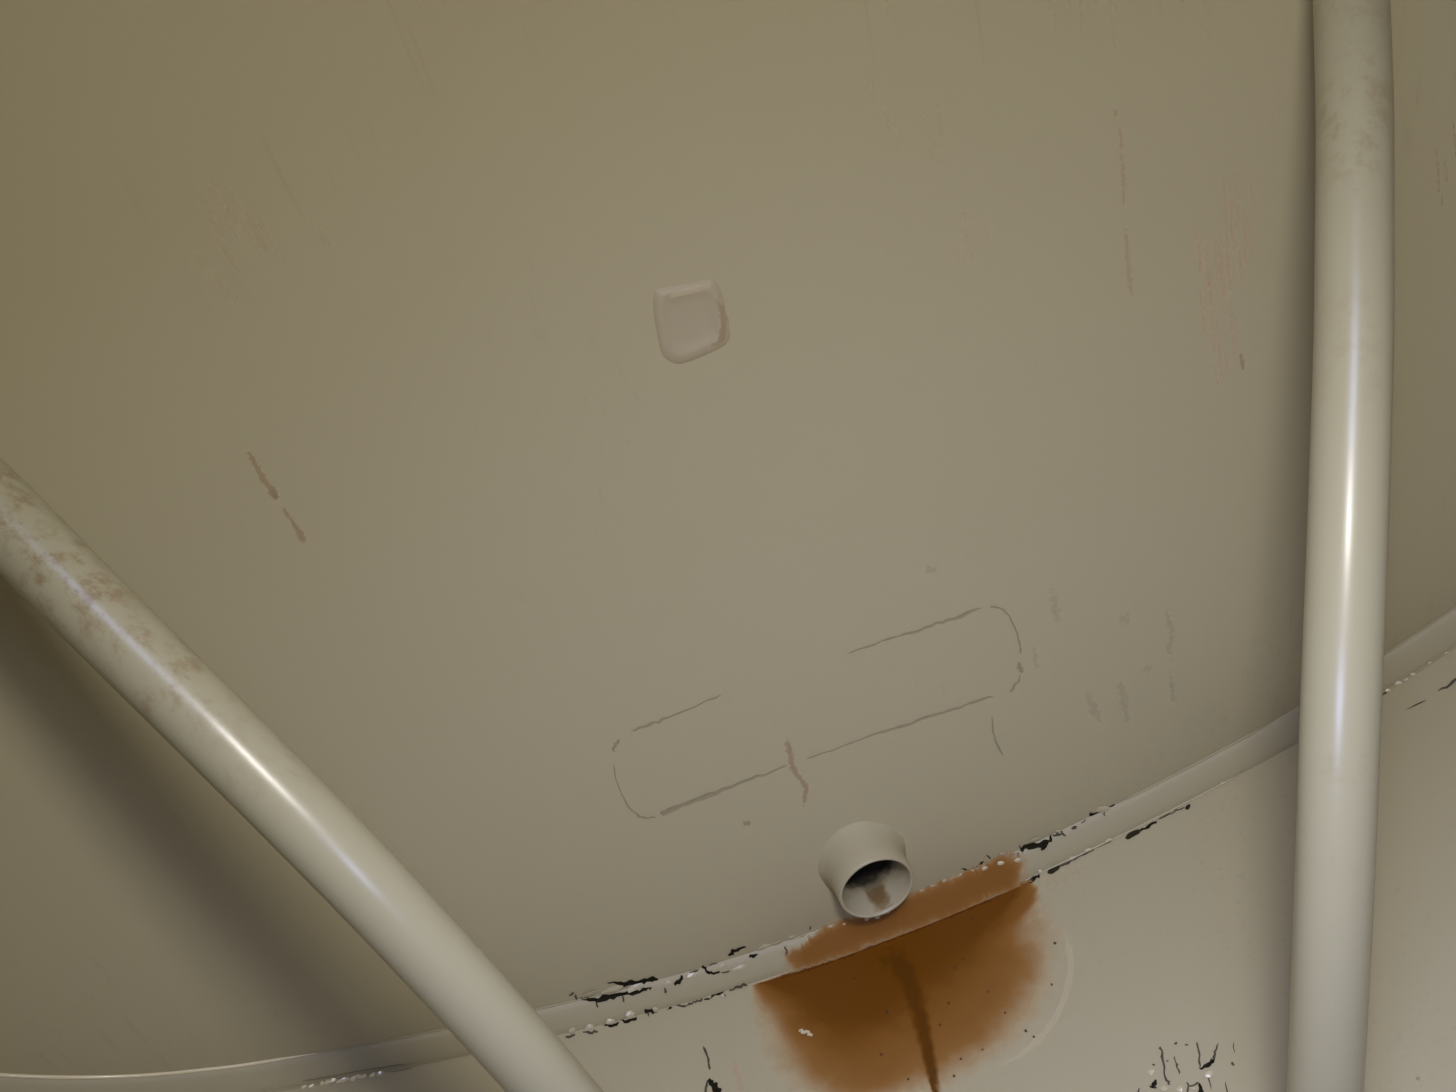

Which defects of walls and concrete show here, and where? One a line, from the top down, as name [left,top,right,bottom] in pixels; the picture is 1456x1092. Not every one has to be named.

corrosion [753,852,1056,1092]
peeling [703,1046,722,1092]
peeling [1137,1042,1235,1092]